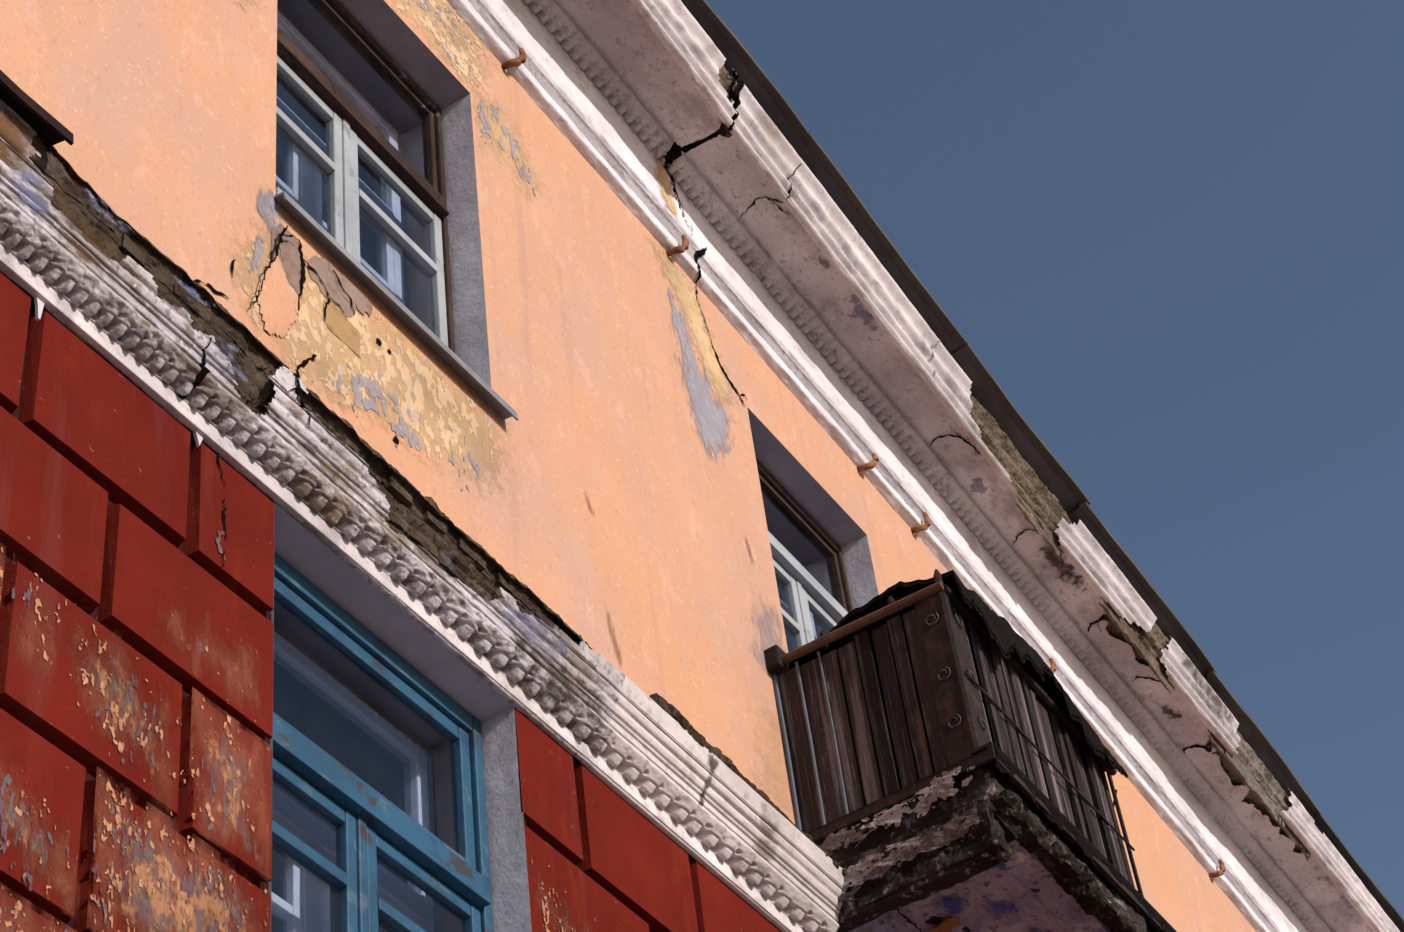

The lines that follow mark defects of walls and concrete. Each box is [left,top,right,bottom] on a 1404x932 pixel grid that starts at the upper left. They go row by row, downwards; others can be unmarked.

peeling [393,0,538,196]
crack [194,226,355,320]
crack [661,70,747,406]
crack [178,337,212,399]
crack [288,354,317,425]
peeling [29,135,594,651]
crack [216,452,227,567]
flaking render [970,394,1073,560]
flaking render [1099,597,1174,694]
peeling [0,612,270,932]
spalling [649,693,1144,932]
flaking render [1204,731,1310,862]